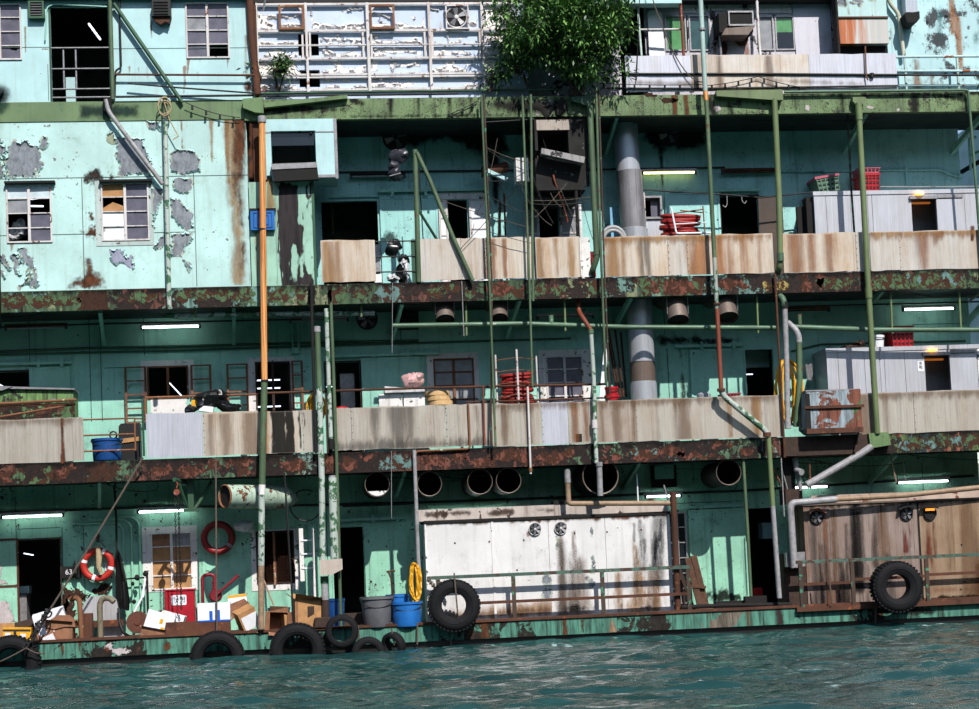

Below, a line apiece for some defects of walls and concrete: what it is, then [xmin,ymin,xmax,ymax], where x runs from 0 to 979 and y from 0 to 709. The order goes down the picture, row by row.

peeling [257,5,516,89]
corrosion [950,0,962,67]
peeling [0,124,79,200]
peeling [106,120,201,273]
corrosion [225,119,254,283]
corrosion [70,259,101,288]
corrosion [691,235,731,274]
corrosion [791,234,800,272]
peeling [0,601,16,623]
water stain [559,538,580,616]